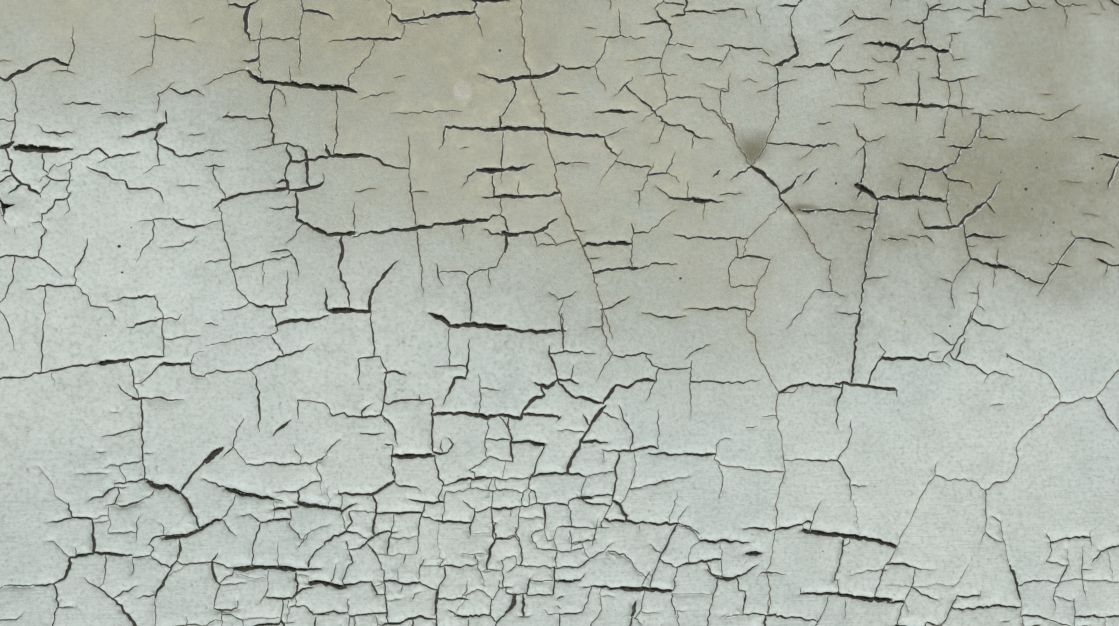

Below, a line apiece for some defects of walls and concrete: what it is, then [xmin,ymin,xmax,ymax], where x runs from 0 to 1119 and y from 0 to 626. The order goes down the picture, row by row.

crack [0,0,768,626]
crack [545,421,958,626]
crack [924,370,1119,626]